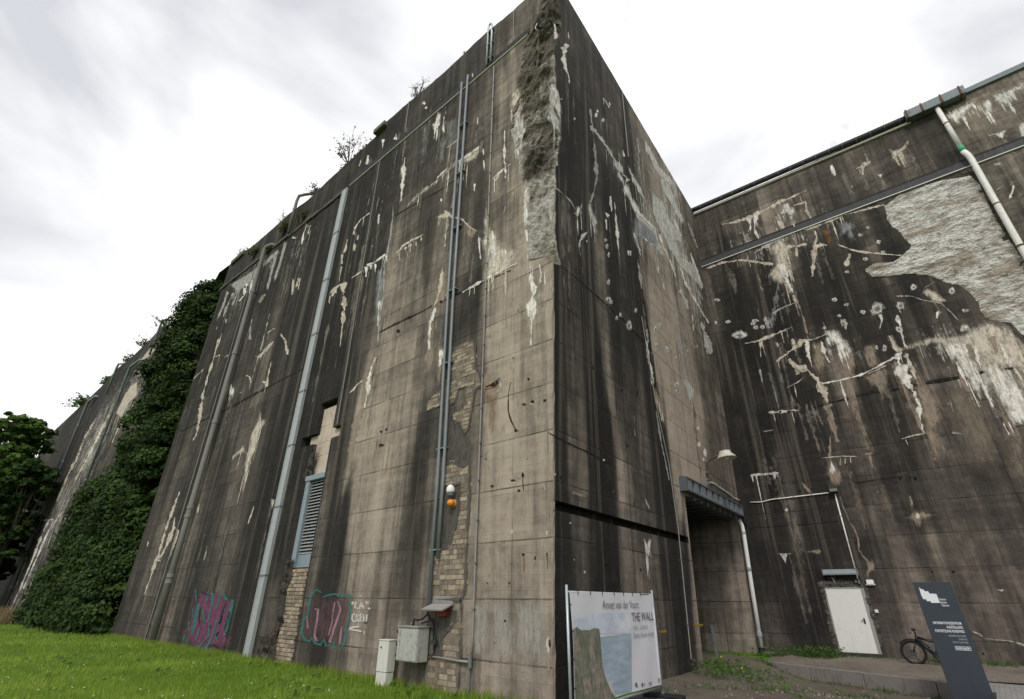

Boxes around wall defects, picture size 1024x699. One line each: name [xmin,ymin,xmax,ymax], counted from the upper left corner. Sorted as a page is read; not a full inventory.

spalling [511,0,562,271]
efflorescence [548,163,619,255]
peeling [863,171,1024,335]
flaking render [427,339,502,435]
crack [507,382,518,432]
efflorescence [692,315,713,354]
water stain [707,191,1024,476]
efflorescence [4,462,75,610]
water stain [144,492,189,599]
spalling [257,559,294,662]
flaking render [424,460,472,694]